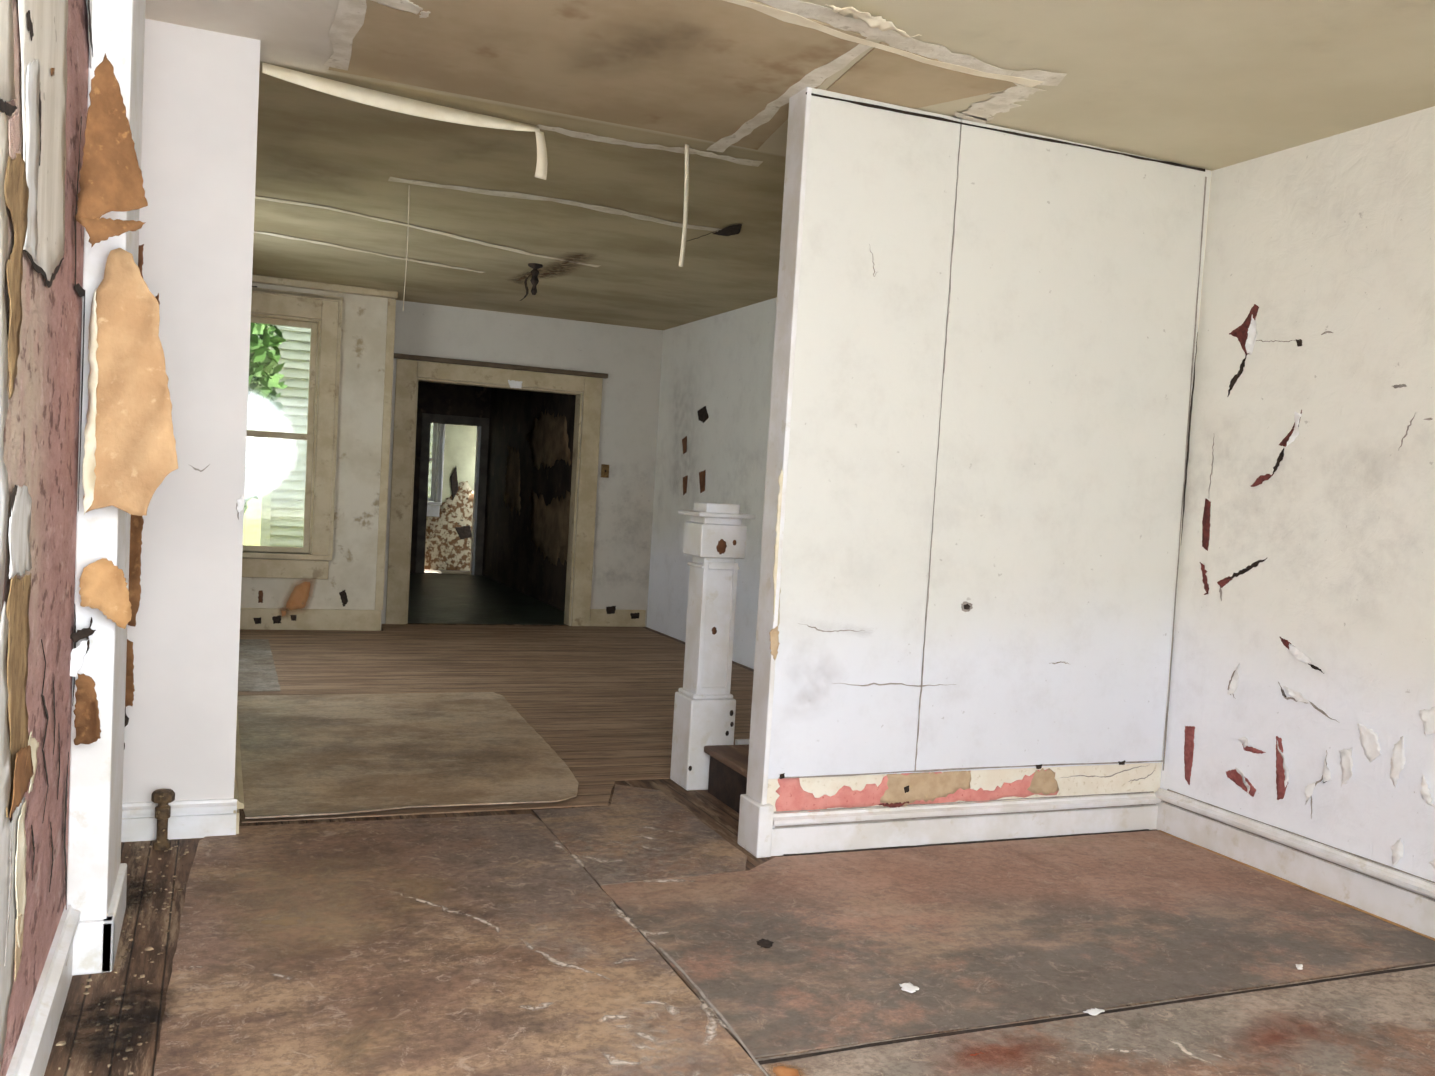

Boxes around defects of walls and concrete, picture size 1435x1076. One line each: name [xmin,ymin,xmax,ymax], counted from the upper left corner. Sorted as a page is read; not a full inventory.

peeling [825,4,922,38]
peeling [1227,304,1296,397]
peeling [1251,410,1302,487]
peeling [1200,438,1267,601]
spalling [253,590,297,624]
peeling [70,617,96,679]
peeling [1280,637,1324,674]
peeling [28,732,39,793]
peeling [775,768,1059,813]
peeling [1184,726,1195,785]
peeling [1226,767,1256,797]
peeling [1238,736,1289,800]